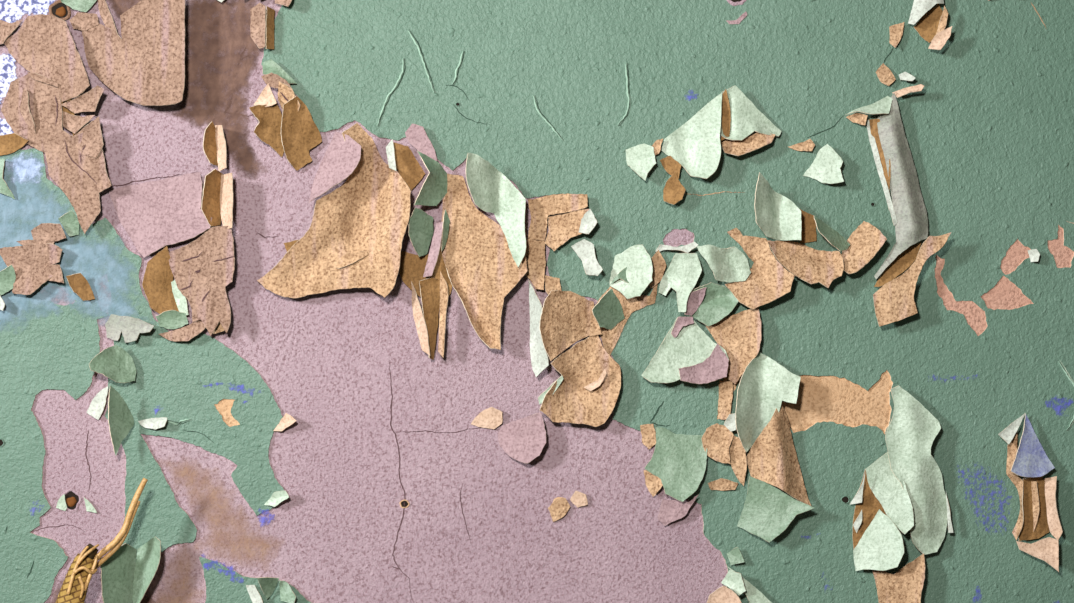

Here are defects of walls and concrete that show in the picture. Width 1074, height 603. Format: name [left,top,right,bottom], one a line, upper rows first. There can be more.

peeling [889,0,952,50]
crack [377,30,490,126]
crack [533,96,563,141]
crack [619,65,630,126]
peeling [789,139,844,184]
peeling [846,63,1040,336]
flaking render [1048,225,1074,268]
flaking render [0,0,781,603]
peeling [538,172,953,603]
crack [389,363,482,594]
peeling [998,413,1063,572]